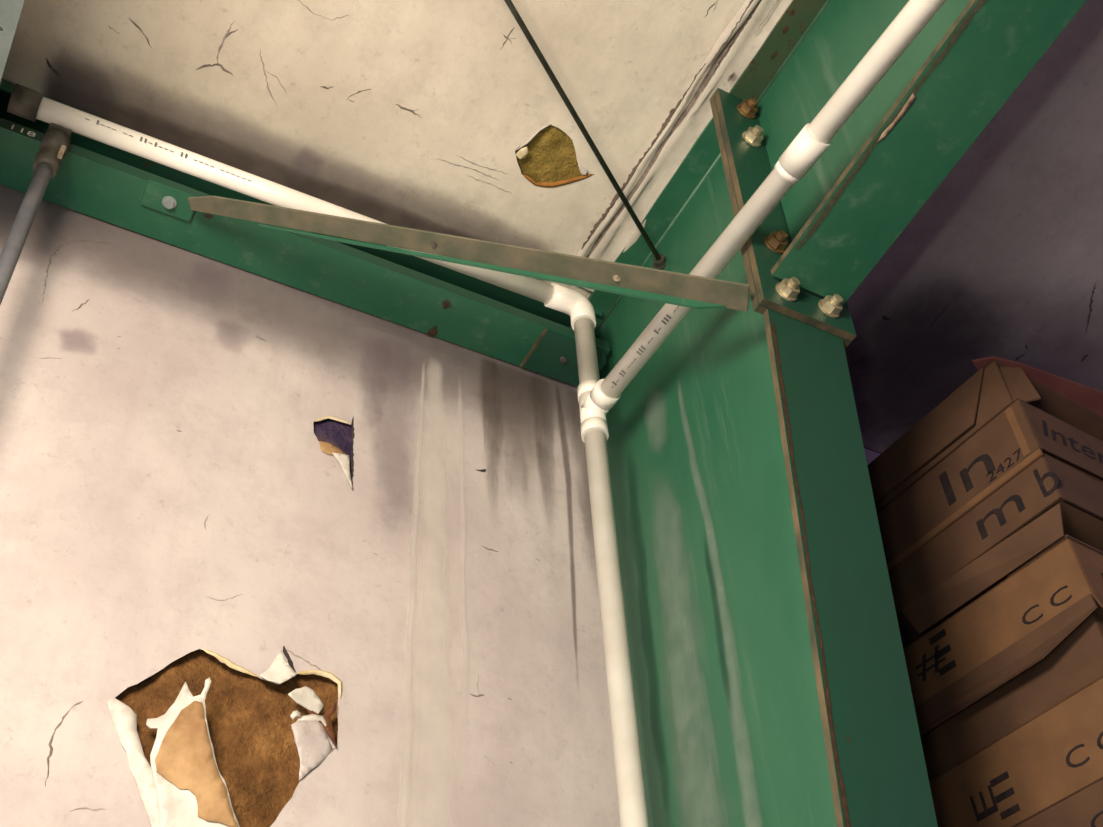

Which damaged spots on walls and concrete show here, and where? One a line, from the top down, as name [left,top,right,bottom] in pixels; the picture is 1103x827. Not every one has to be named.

crack [196,20,238,75]